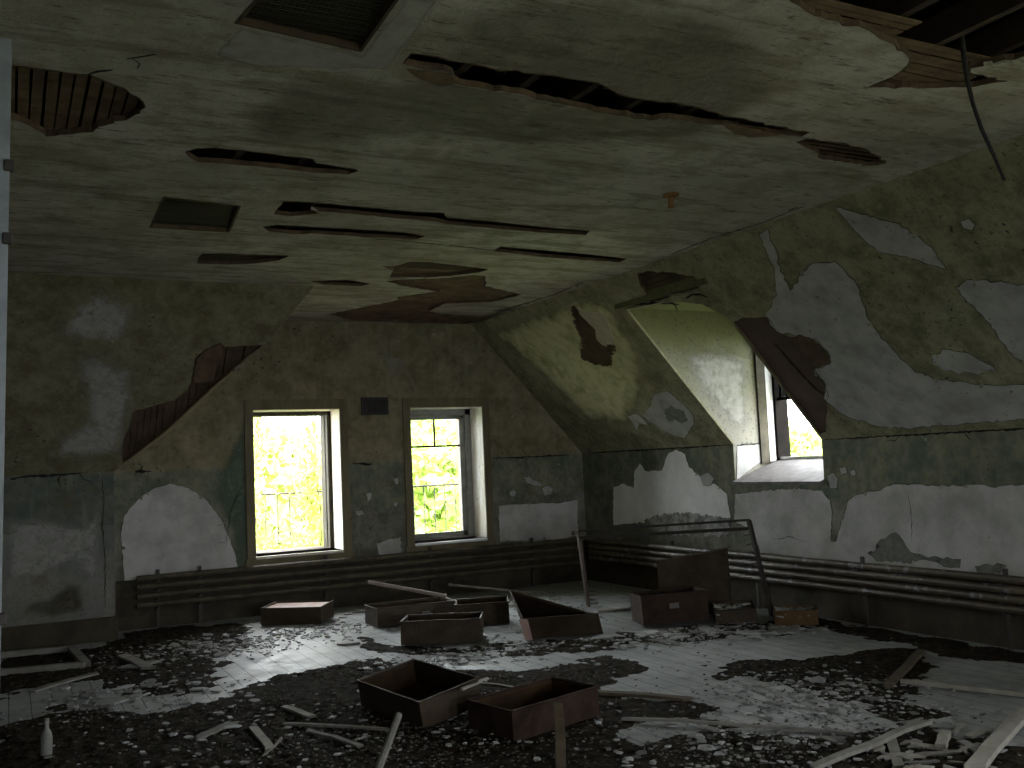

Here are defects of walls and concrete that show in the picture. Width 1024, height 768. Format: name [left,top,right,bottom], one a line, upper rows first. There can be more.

peeling [836,207,947,270]
spalling [570,305,616,367]
spalling [637,271,699,306]
peeling [734,228,1024,434]
spalling [122,343,262,462]
crack [11,472,106,599]
peeling [120,483,238,581]
peeling [498,476,579,542]
peeling [612,390,1024,577]